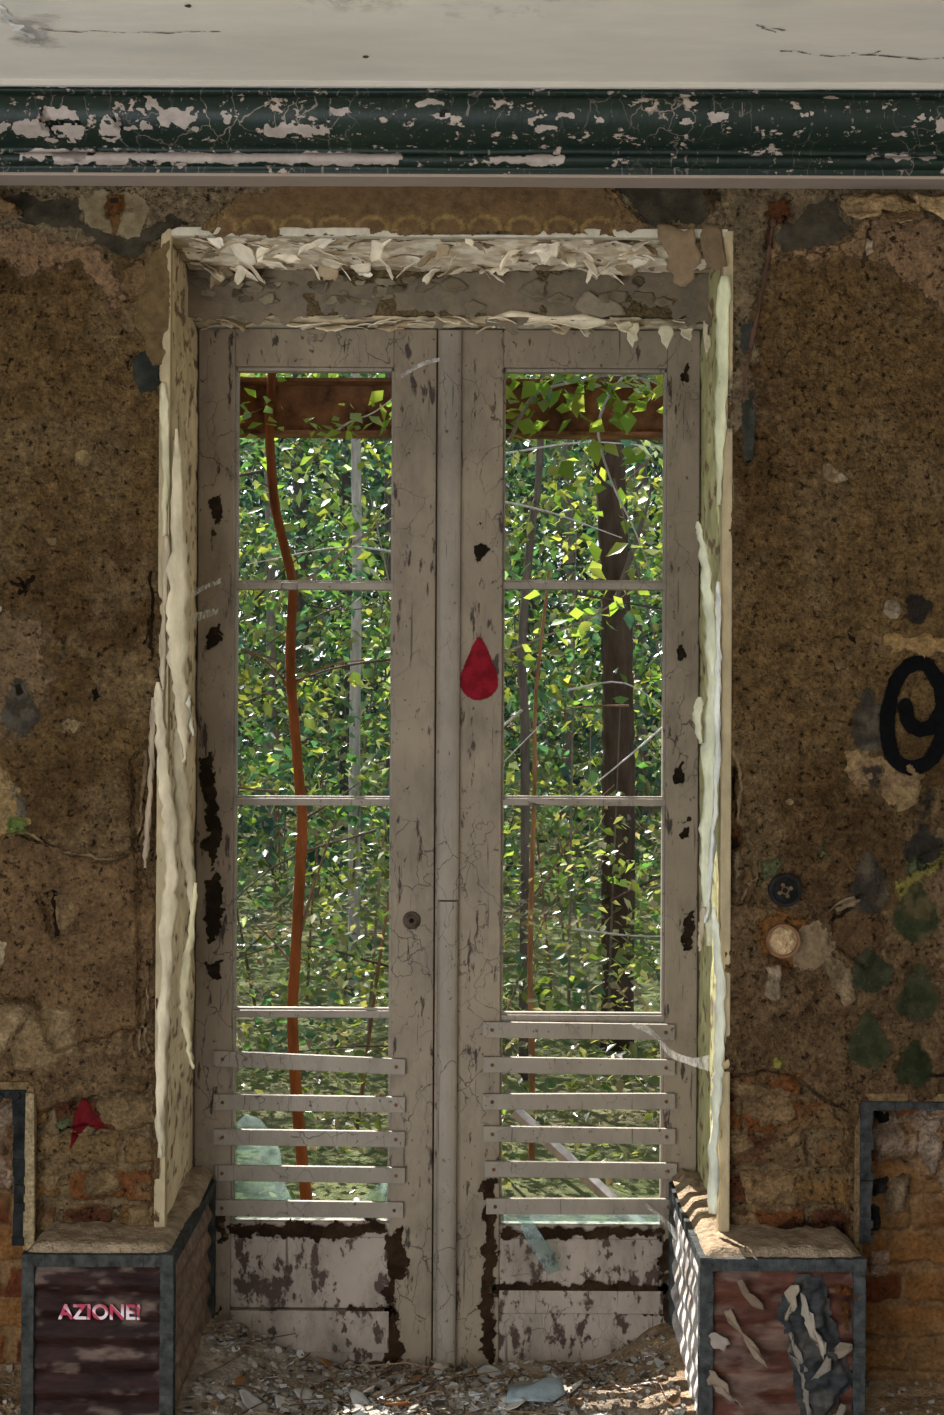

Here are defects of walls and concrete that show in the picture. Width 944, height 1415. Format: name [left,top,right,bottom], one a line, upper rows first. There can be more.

crack [756,24,944,60]
peeling [0,95,403,167]
peeling [415,98,451,120]
peeling [487,154,566,167]
peeling [528,112,575,133]
peeling [676,111,729,125]
peeling [0,188,944,505]
spalling [883,600,944,658]
spalling [0,351,198,1236]
spalling [844,749,944,851]
flaking render [692,521,854,1234]
spalling [764,896,886,1006]